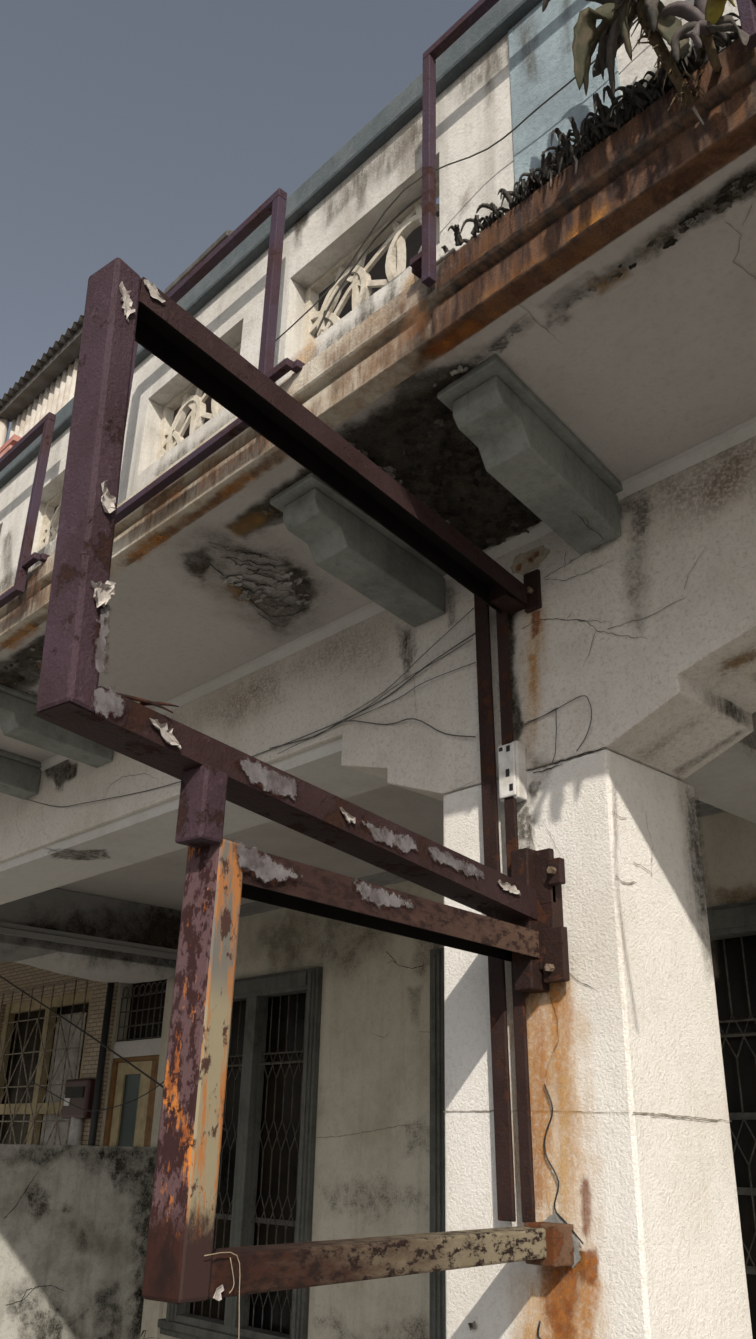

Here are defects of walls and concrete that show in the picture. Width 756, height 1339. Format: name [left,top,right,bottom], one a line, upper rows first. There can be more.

rust [333,39,756,387]
peeling [185,469,316,627]
crack [544,513,615,581]
crack [521,552,703,661]
rust [527,982,588,1234]
water stain [14,1144,155,1262]
water stain [10,1299,75,1339]
water stain [96,1287,144,1339]
rust [526,1251,598,1339]